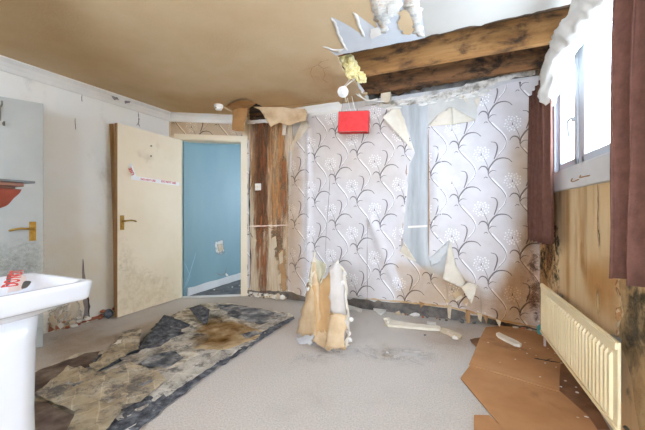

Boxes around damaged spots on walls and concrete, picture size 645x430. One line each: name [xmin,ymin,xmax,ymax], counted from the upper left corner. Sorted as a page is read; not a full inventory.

peeling [323,0,570,57]
flaking render [247,104,268,124]
water stain [248,117,293,300]
flaking render [271,231,283,264]
water stain [529,226,559,288]
flaking render [48,301,114,333]
water stain [530,284,539,320]
water stain [624,286,645,352]